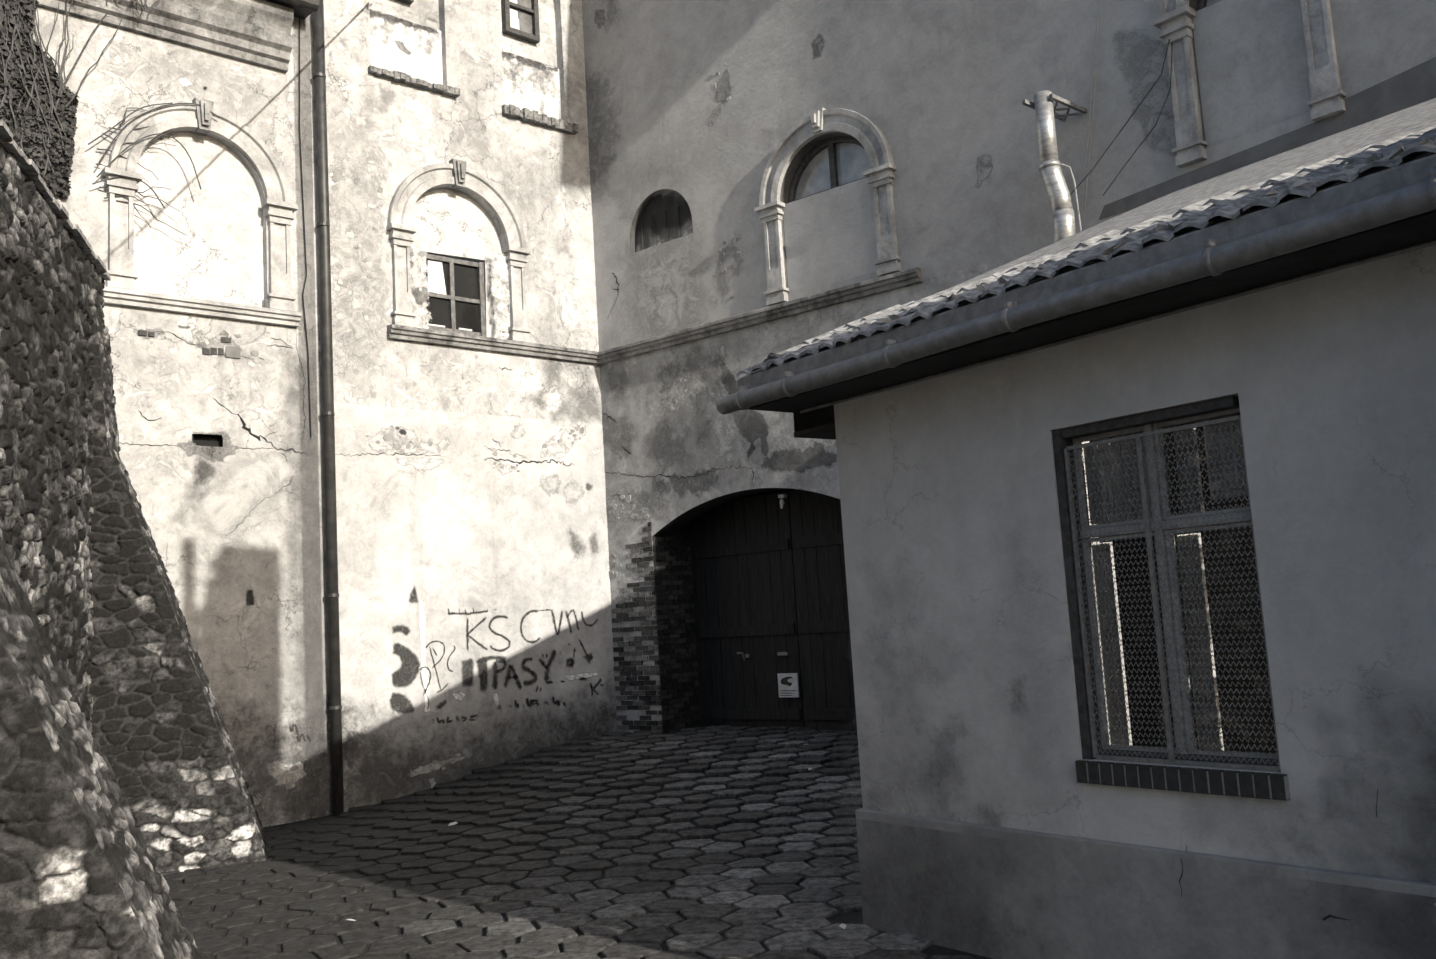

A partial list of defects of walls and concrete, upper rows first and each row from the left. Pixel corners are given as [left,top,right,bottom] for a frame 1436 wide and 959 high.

flaking render [708,69,732,127]
flaking render [714,236,742,305]
flaking render [134,326,293,367]
crack [119,410,180,447]
crack [213,338,308,536]
flaking render [335,425,450,472]
flaking render [484,362,671,522]
flaking render [608,543,621,580]
flaking render [266,761,306,790]